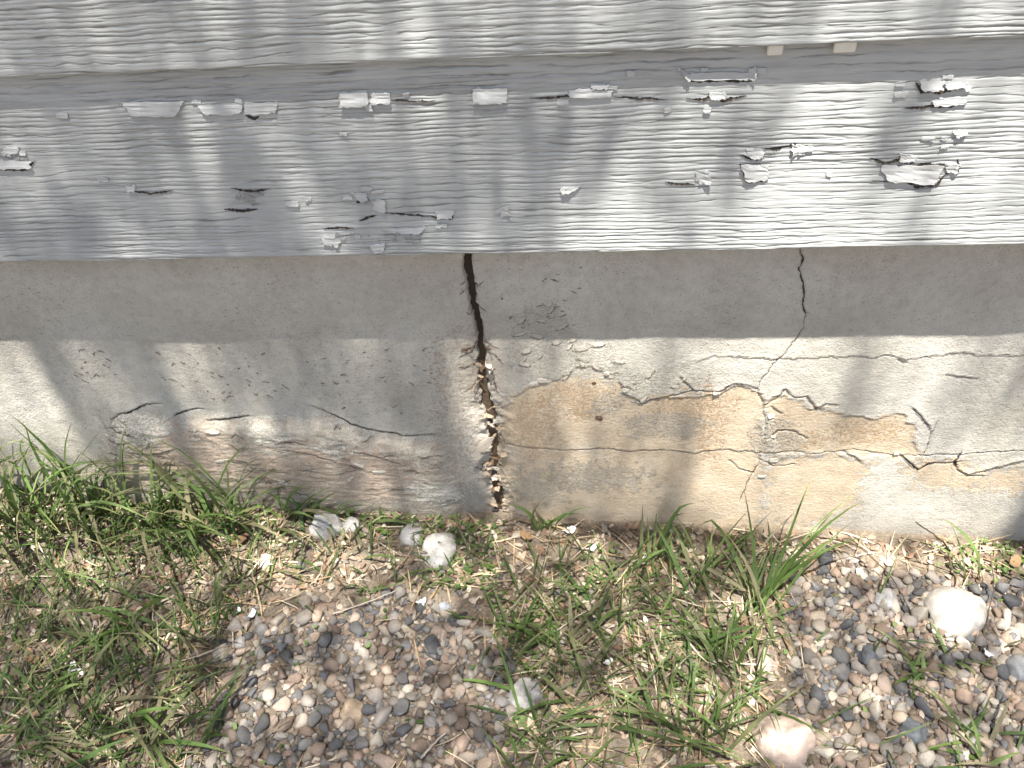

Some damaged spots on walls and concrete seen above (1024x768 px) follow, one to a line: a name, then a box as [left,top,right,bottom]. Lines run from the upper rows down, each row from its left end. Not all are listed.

peeling [120,98,278,120]
peeling [338,90,435,112]
peeling [472,86,508,105]
peeling [530,82,671,113]
peeling [678,66,767,114]
peeling [894,75,972,109]
peeling [740,143,813,183]
peeling [870,152,960,189]
crack [459,251,1022,509]
crack [111,403,245,455]
crack [282,406,429,464]
peeling [483,366,1024,527]